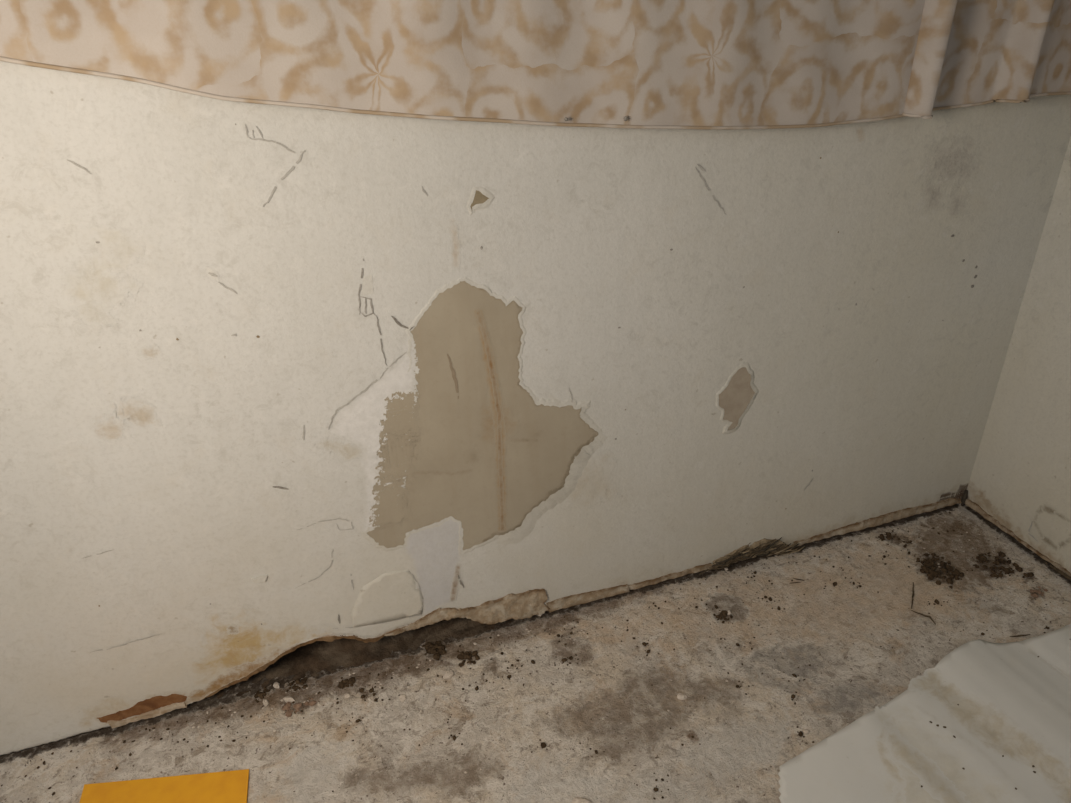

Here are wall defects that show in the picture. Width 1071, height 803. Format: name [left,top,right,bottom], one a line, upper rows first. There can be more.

peeling [466,186,495,215]
peeling [327,277,608,555]
peeling [716,362,759,434]
spalling [205,498,1071,698]
spalling [107,702,187,728]